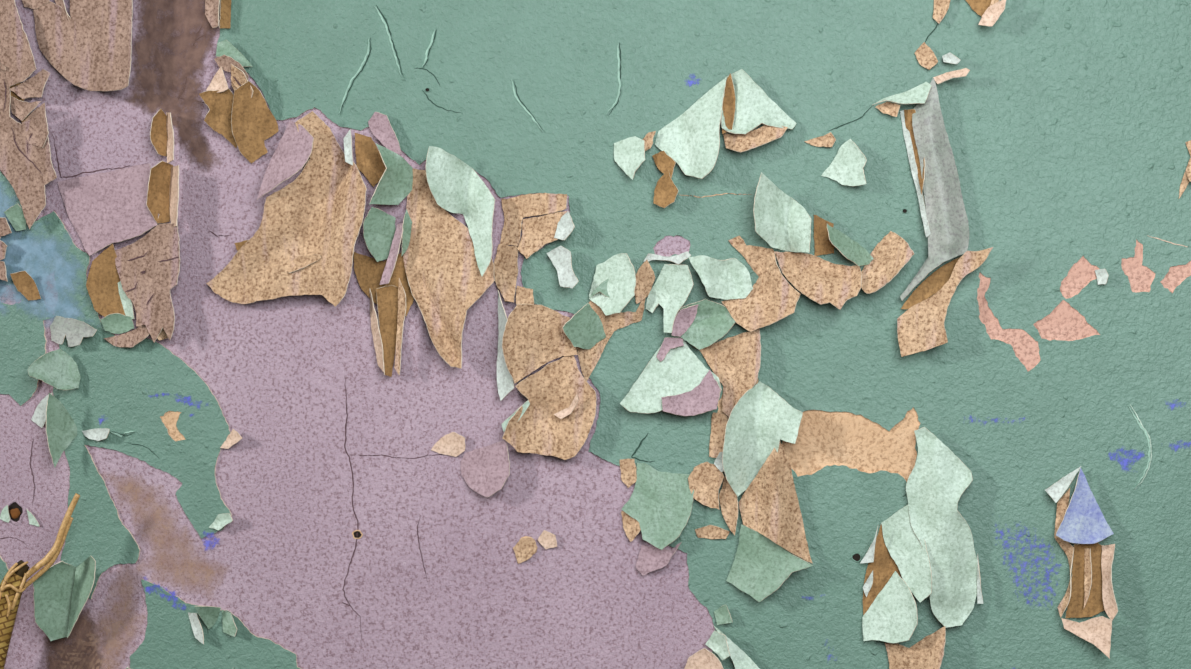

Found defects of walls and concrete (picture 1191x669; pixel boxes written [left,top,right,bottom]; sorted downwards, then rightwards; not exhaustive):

flaking render [0,0,760,669]
crack [339,5,461,116]
crack [511,80,543,130]
crack [606,42,621,115]
peeling [614,69,796,208]
peeling [804,132,867,186]
peeling [966,0,1006,27]
peeling [873,42,1109,371]
flaking render [1121,239,1191,293]
peeling [577,172,983,669]
crack [342,379,458,647]
peeling [1045,466,1118,659]